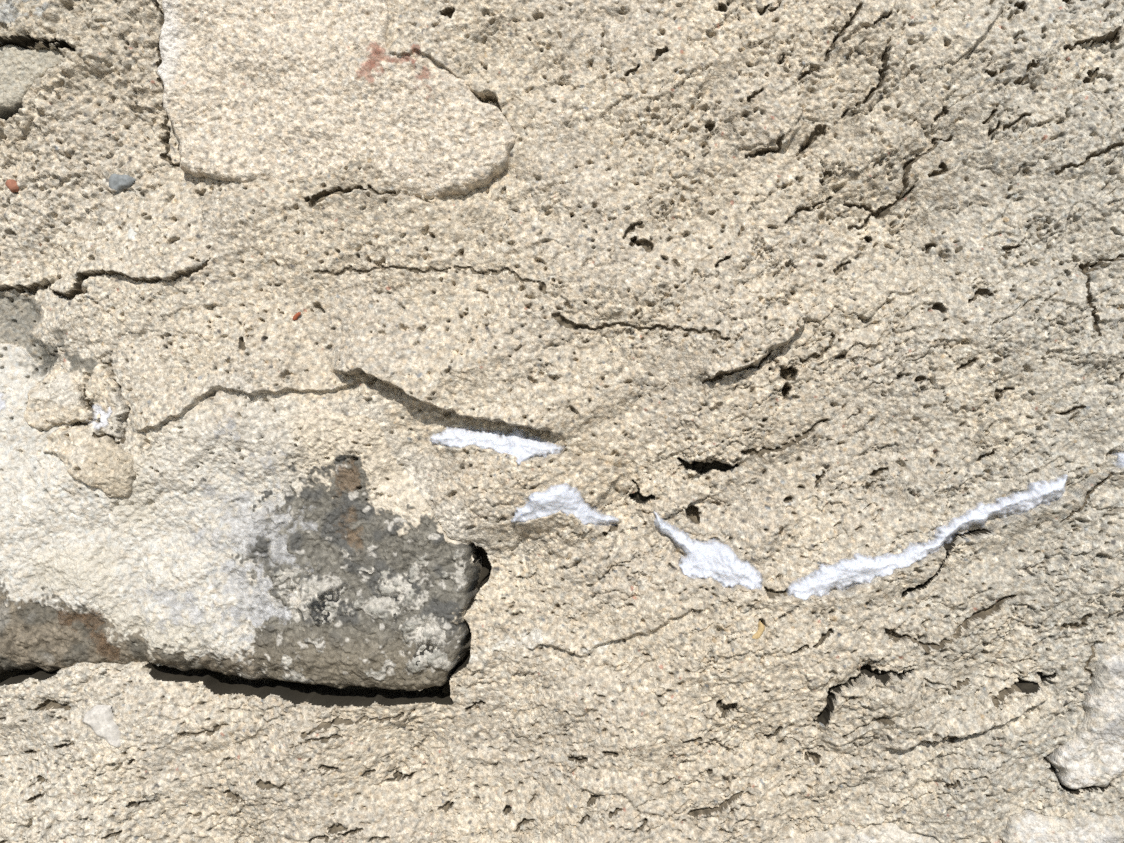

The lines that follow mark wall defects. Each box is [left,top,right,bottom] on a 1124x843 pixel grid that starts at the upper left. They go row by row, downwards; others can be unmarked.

crack [154,0,181,167]
crack [745,3,892,159]
crack [984,20,1124,85]
crack [304,184,399,207]
crack [785,106,952,231]
crack [0,258,211,300]
crack [313,265,731,341]
crack [677,418,828,475]
crack [0,668,71,712]
crack [145,543,492,782]
crack [813,595,1016,738]
crack [950,672,1056,708]